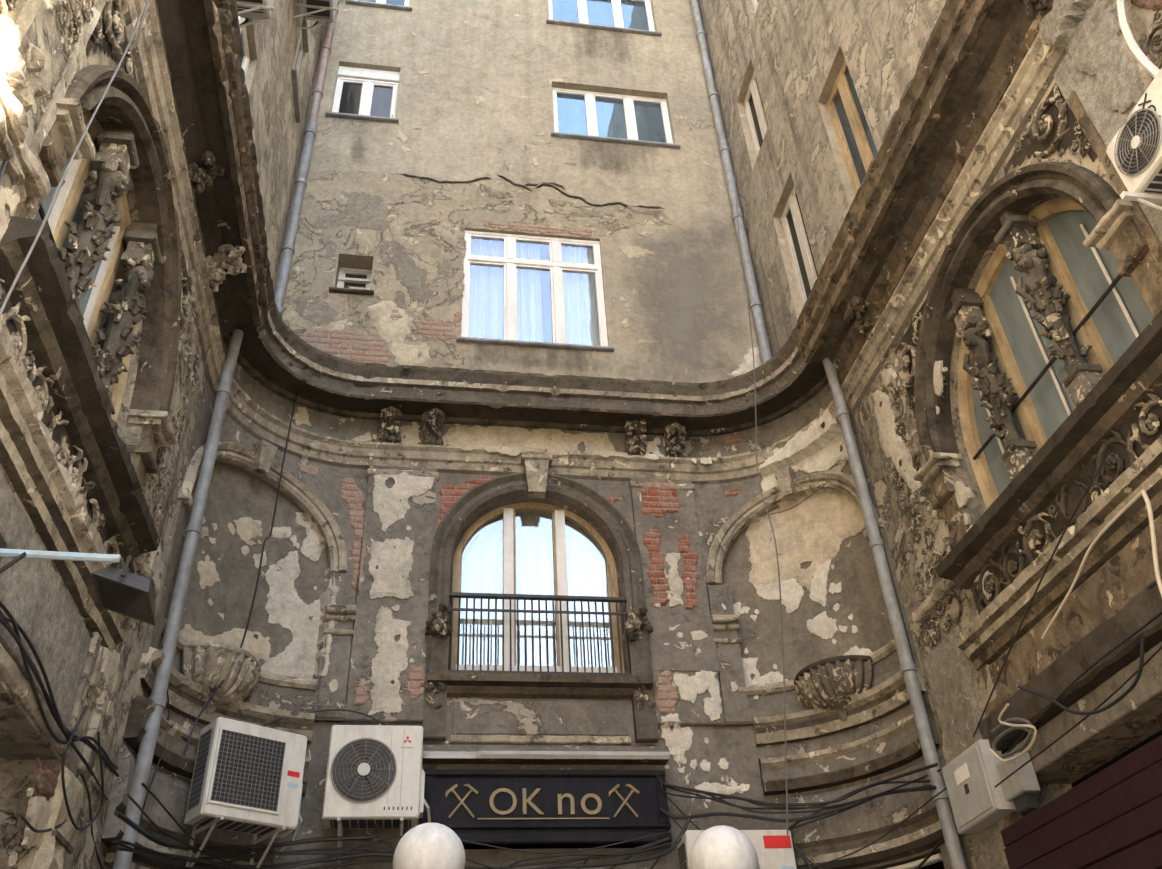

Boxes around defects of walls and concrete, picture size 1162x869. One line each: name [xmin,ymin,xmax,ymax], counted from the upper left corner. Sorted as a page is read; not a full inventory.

flaking render [1039,0,1145,113]
crack [400,173,665,209]
flaking render [280,170,672,369]
flaking render [398,422,423,444]
flaking render [442,424,630,463]
flaking render [98,645,121,682]
flaking render [133,546,165,604]
flaking render [179,469,500,725]
flaking render [639,437,699,610]
flaking render [677,630,708,653]
flaking render [721,408,873,656]
flaking render [655,648,788,803]